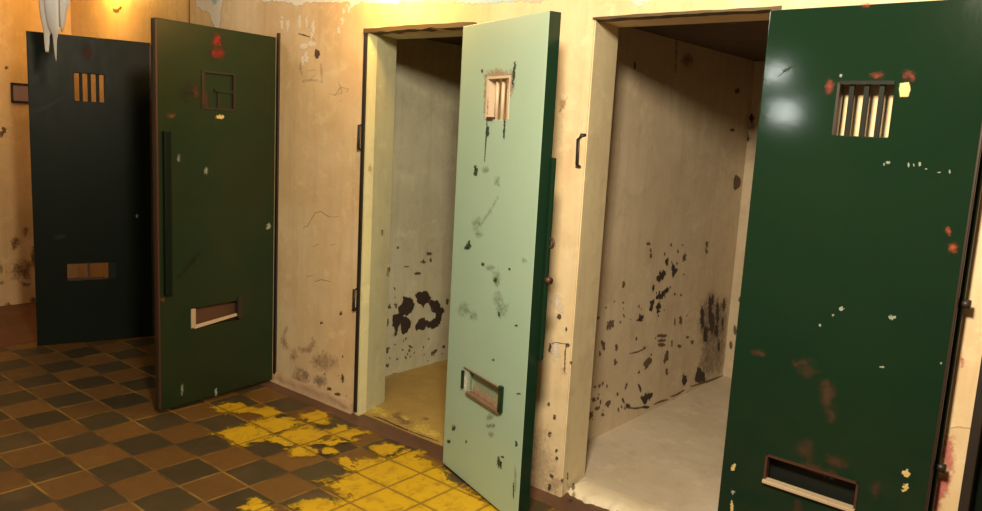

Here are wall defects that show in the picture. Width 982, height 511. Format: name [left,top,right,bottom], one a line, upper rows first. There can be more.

peeling [196,0,223,28]
peeling [386,287,449,368]
peeling [597,243,687,365]
peeling [635,334,694,375]
water stain [682,295,726,385]
peeling [589,382,628,420]
water stain [638,384,653,409]
peeling [209,388,499,511]